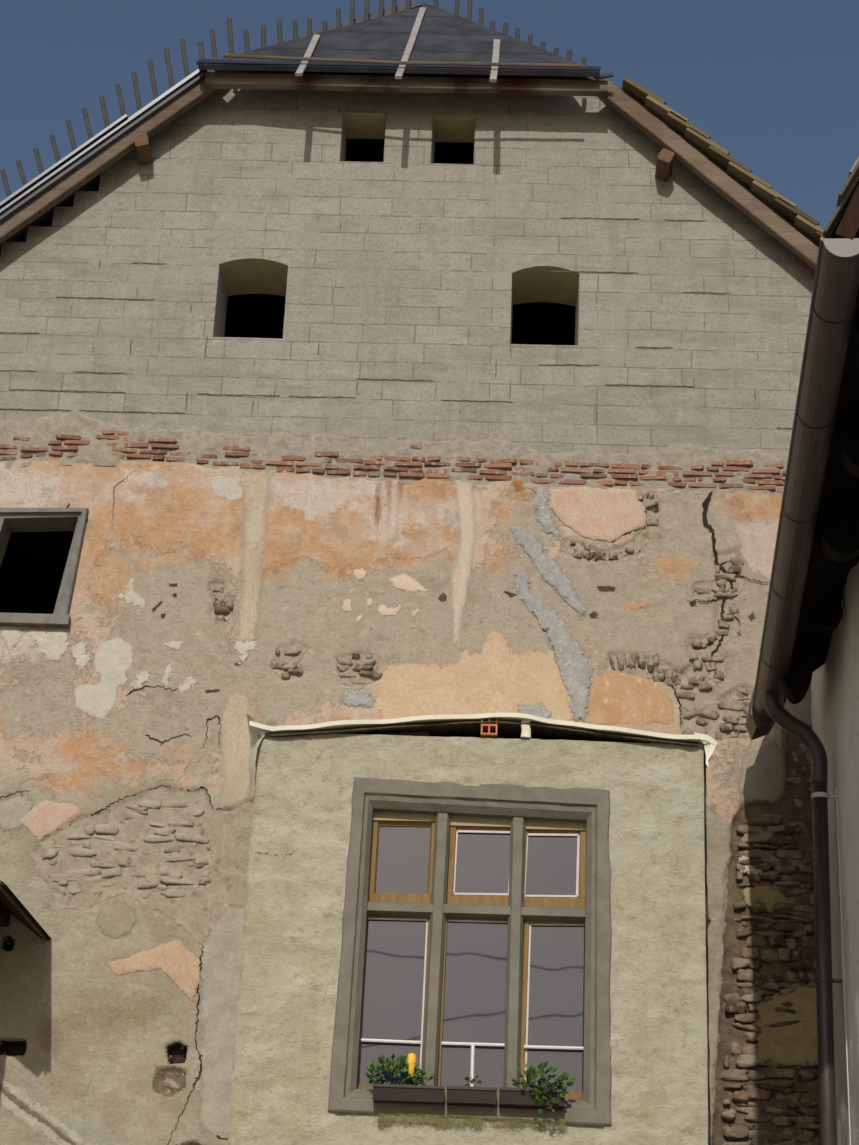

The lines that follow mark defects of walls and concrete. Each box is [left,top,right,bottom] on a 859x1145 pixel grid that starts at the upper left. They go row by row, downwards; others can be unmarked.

spalling [206,583,235,623]
peeling [336,516,779,740]
peeling [549,486,667,563]
crack [687,491,768,657]
crack [39,785,230,846]
spalling [21,786,253,1001]
spalling [711,732,820,1145]
crack [167,945,204,1145]